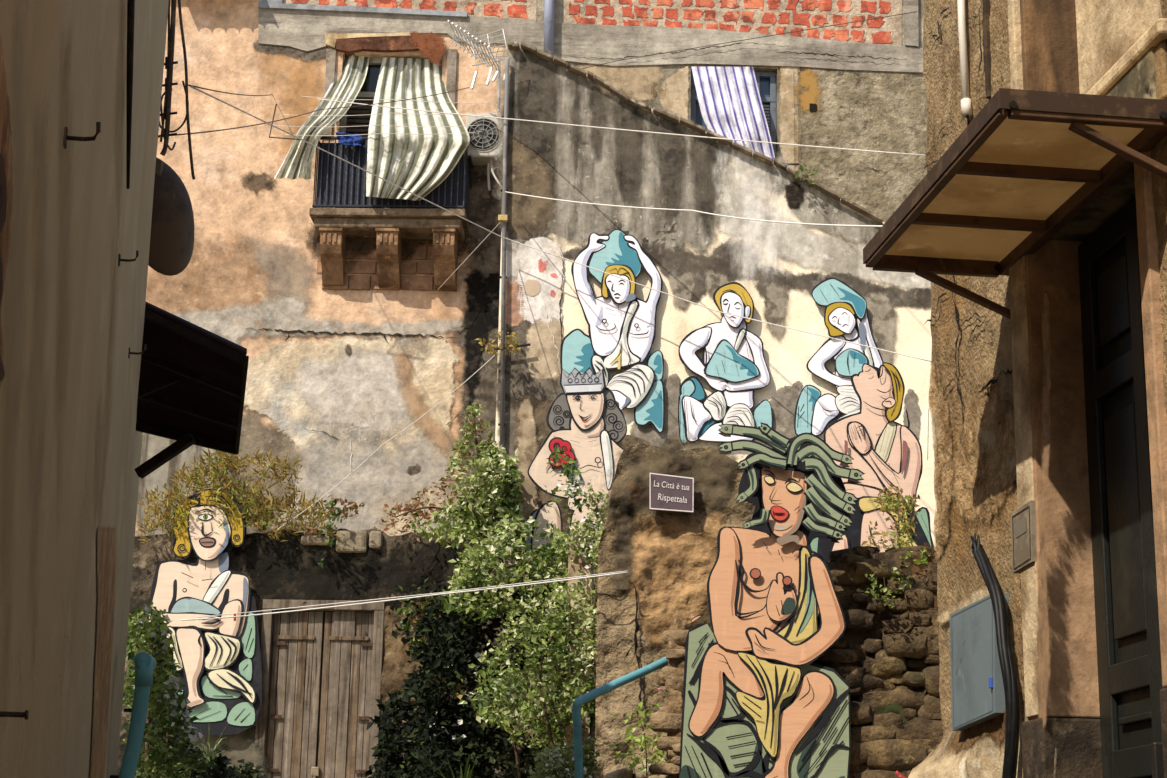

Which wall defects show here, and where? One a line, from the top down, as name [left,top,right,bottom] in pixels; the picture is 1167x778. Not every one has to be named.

damp [305,223,320,256]
damp [345,237,377,255]
crack [248,280,492,370]
damp [401,239,433,259]
damp [453,39,931,522]
peeling [244,335,462,536]